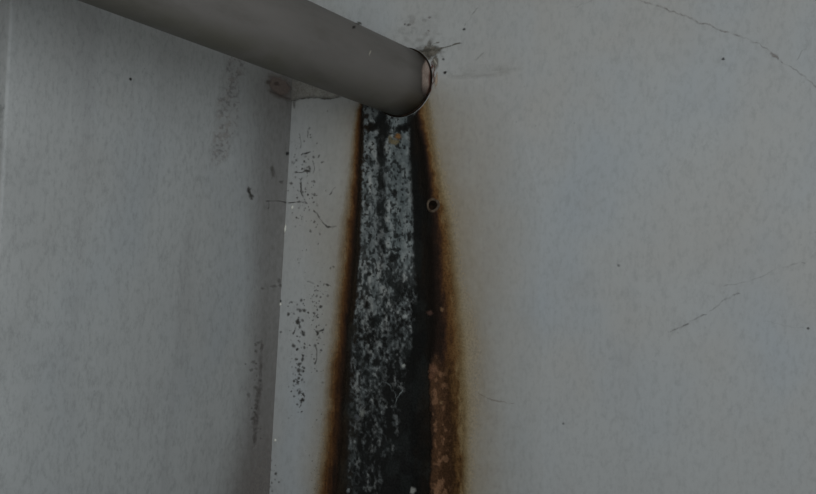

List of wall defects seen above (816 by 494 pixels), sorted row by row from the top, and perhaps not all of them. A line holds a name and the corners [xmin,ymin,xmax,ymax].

water stain [287,294,324,412]
water stain [317,99,479,494]